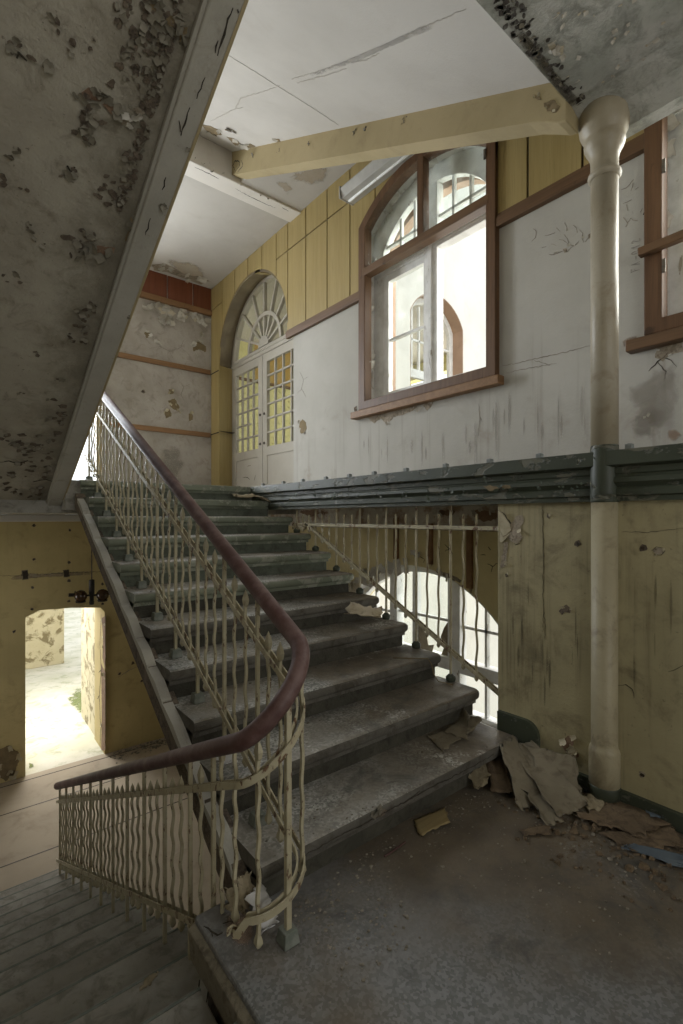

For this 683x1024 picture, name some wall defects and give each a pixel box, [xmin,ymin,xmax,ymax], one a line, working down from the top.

peeling [46,12,96,59]
crack [404,9,466,37]
crack [179,8,379,136]
peeling [71,0,190,241]
peeling [203,125,255,157]
peeling [151,263,211,284]
peeling [142,302,212,357]
flaking render [471,508,524,577]
peeling [0,745,22,781]